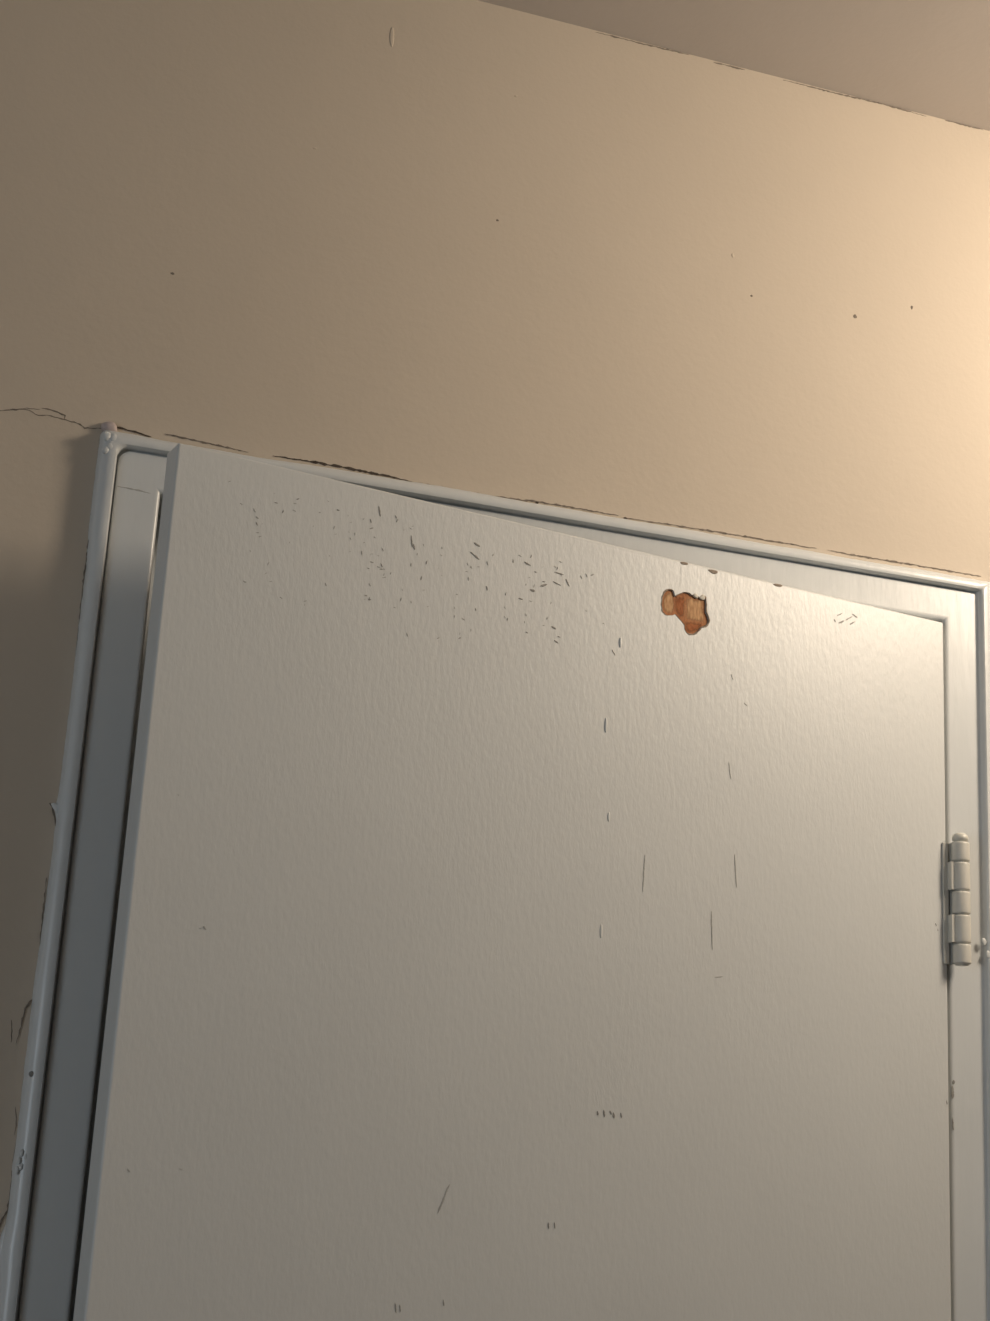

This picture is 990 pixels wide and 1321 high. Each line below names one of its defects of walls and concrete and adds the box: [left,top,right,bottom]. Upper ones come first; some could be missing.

crack [0,408,430,485]
crack [497,496,981,577]
crack [76,539,89,647]